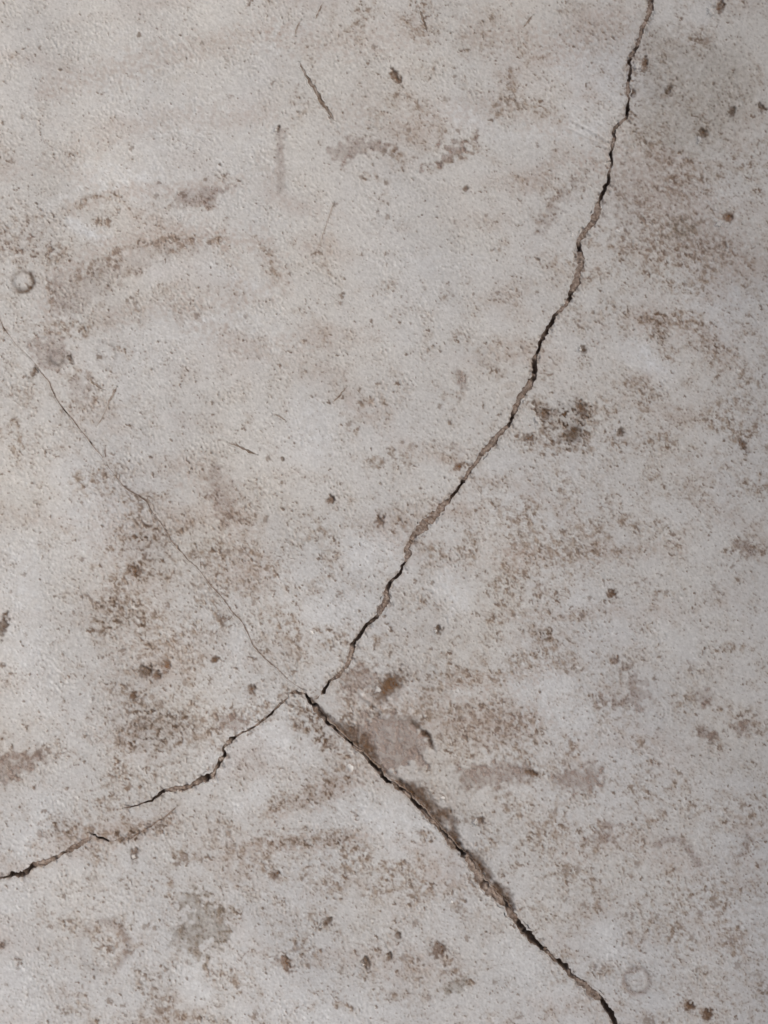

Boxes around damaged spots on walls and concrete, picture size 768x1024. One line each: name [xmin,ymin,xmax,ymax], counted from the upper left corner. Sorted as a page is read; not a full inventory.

crack [0,317,307,693]
crack [288,0,656,1024]
crack [0,805,178,881]
crack [122,696,290,810]